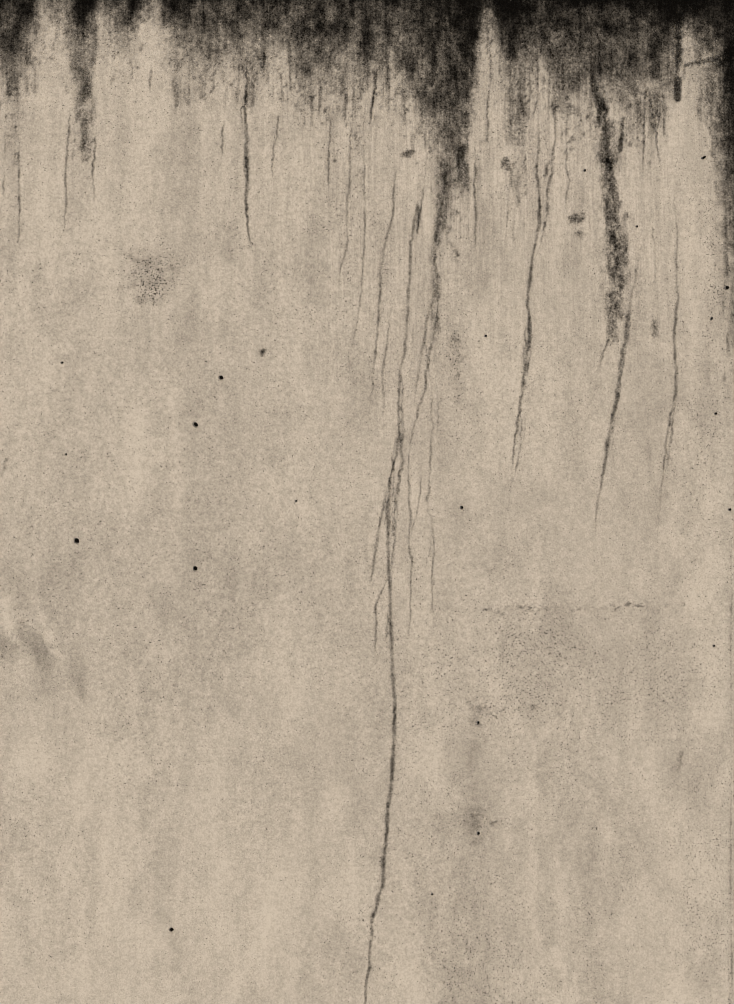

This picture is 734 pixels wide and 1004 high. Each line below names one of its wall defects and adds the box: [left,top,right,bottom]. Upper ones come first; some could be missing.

damp [0,0,734,336]
crack [372,674,396,917]